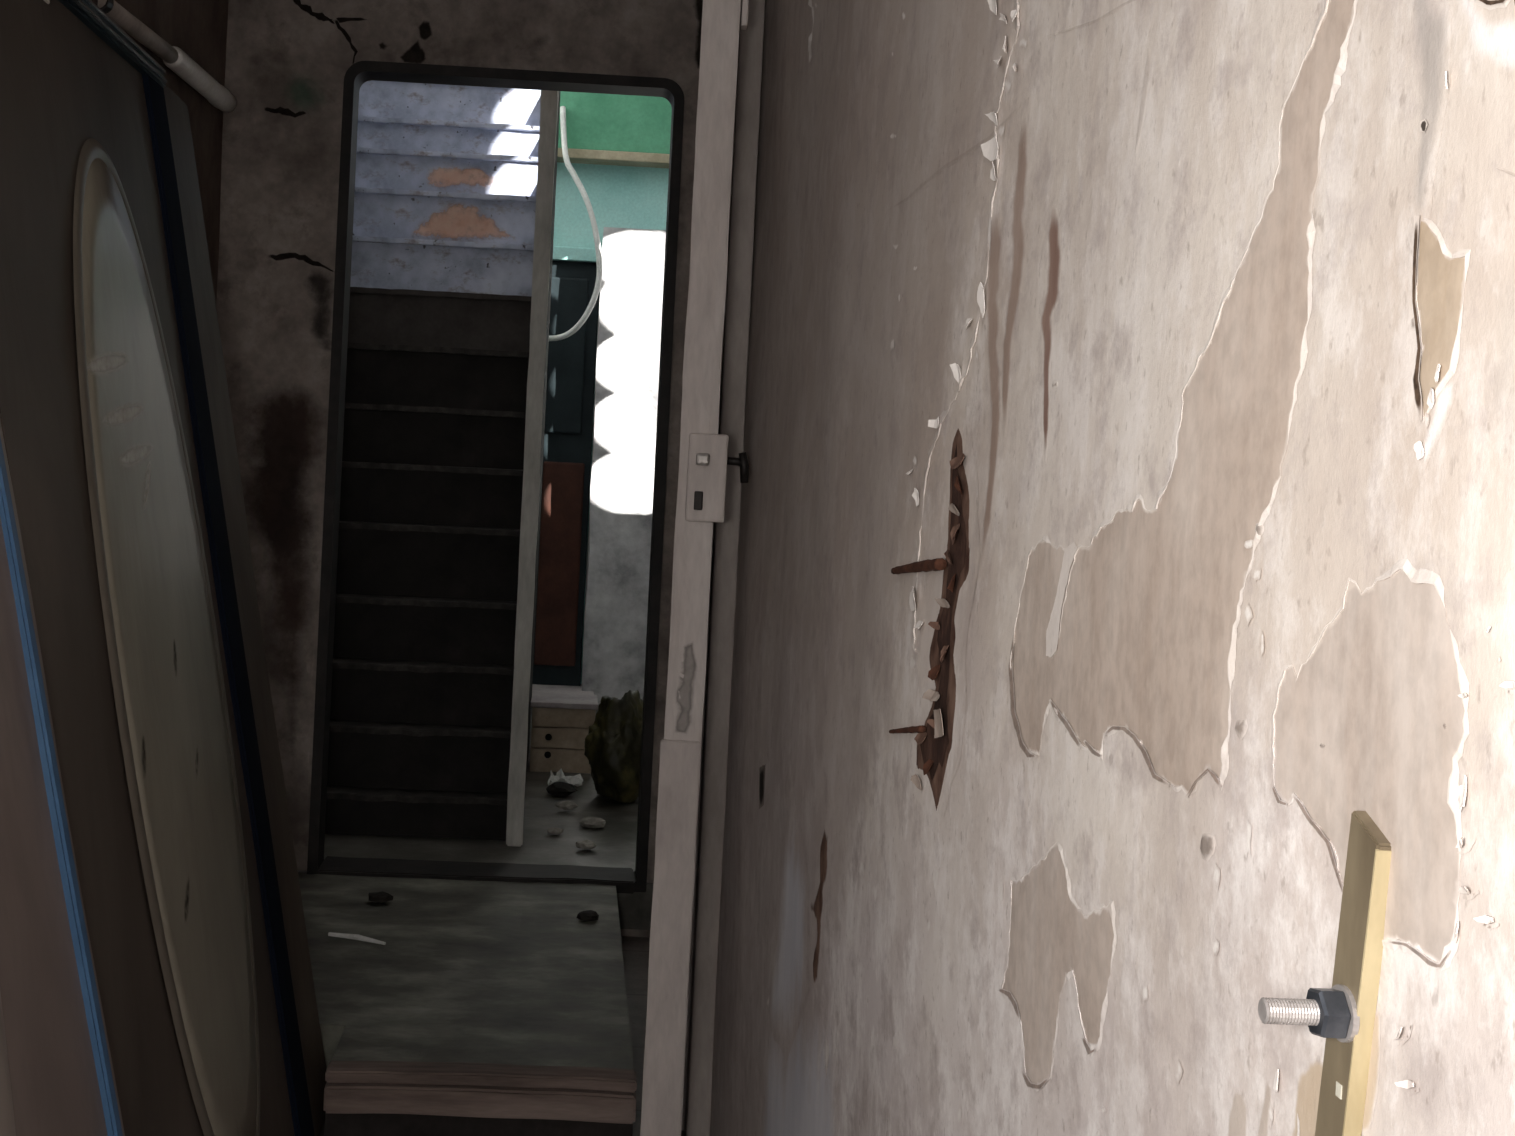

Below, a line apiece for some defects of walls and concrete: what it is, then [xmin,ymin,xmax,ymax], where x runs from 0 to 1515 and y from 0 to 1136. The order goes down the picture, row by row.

crack [263,106,308,118]
crack [292,0,370,65]
peeling [1458,0,1515,75]
crack [266,252,335,383]
peeling [906,0,1027,562]
corrosion [1040,201,1063,464]
peeling [1008,0,1358,798]
peeling [1410,215,1471,470]
water stain [230,363,329,826]
peeling [909,582,924,670]
peeling [1271,558,1499,971]
peeling [997,842,1117,1092]